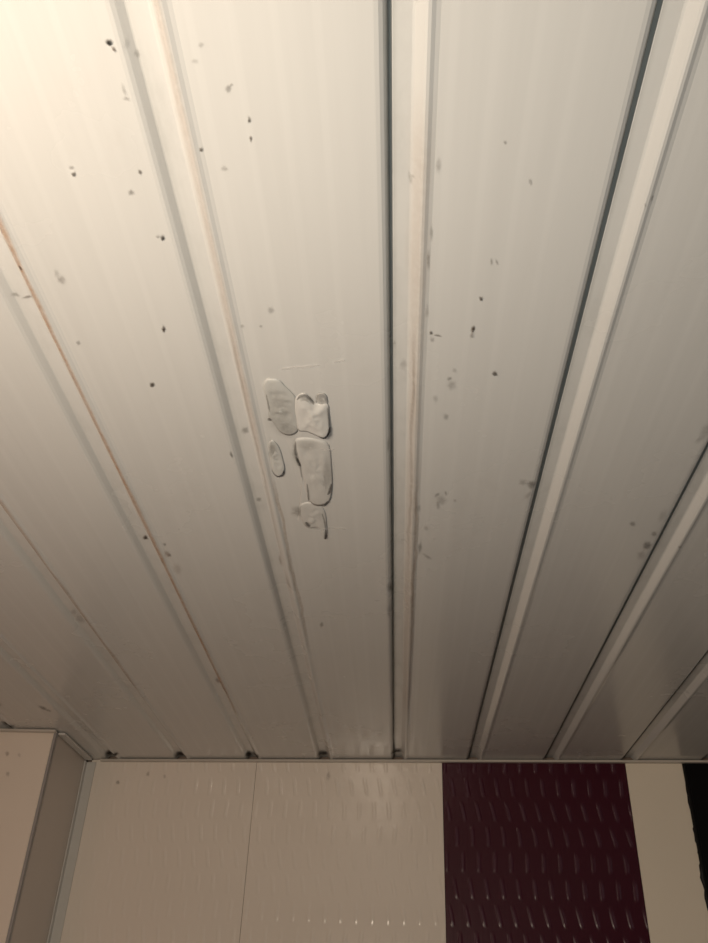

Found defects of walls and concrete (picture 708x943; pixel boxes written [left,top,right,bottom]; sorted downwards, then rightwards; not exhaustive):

peeling [260,374,341,542]